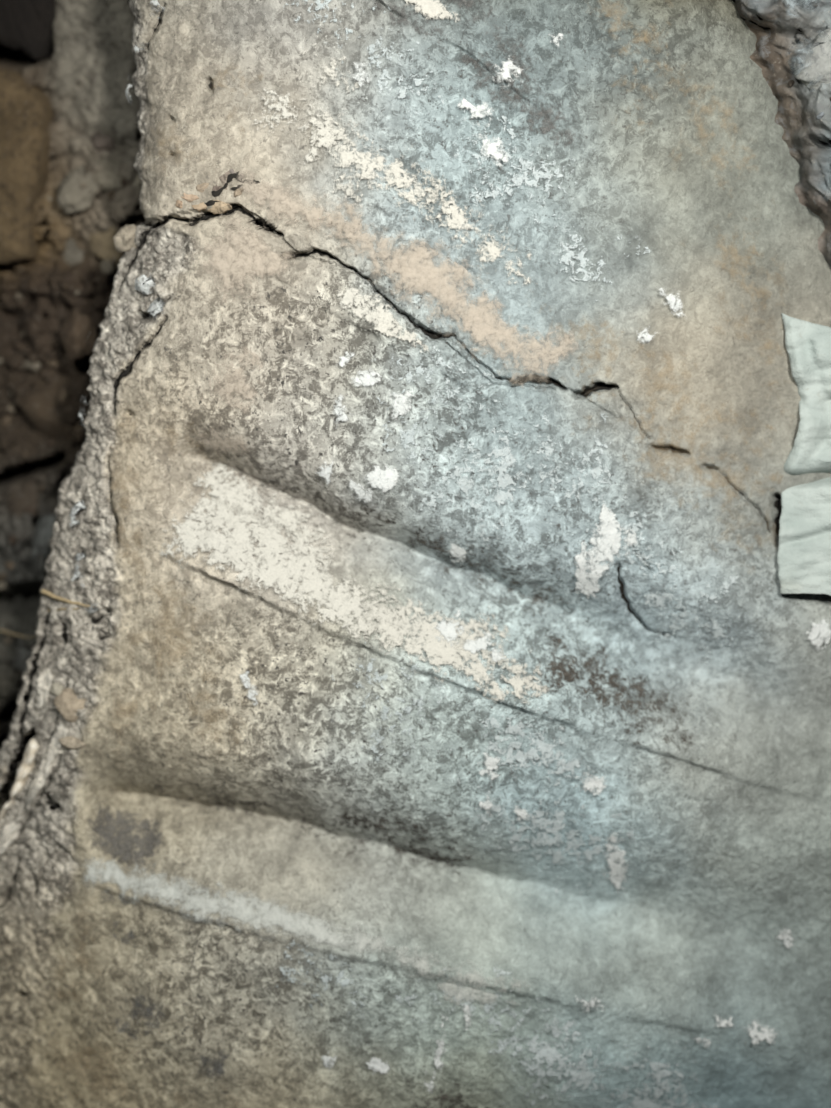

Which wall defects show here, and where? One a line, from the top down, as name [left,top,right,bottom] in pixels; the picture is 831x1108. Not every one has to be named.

peeling [405,0,458,22]
crack [114,205,771,533]
crack [108,456,118,543]